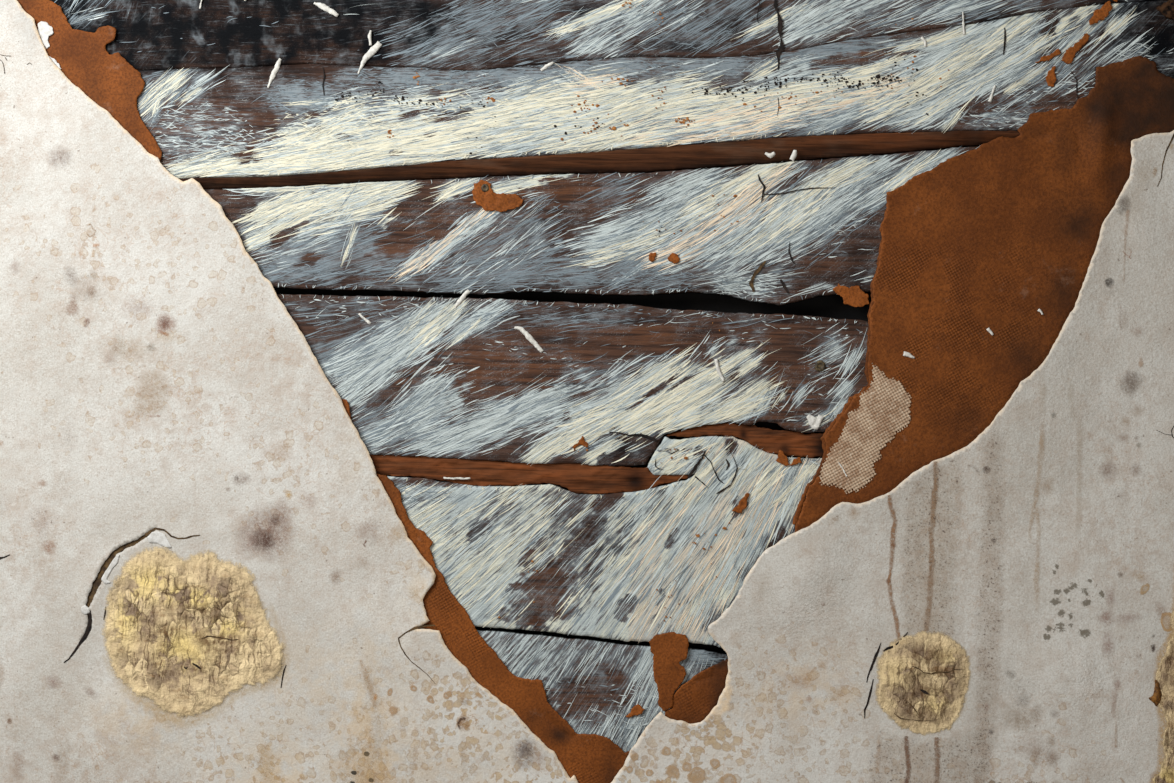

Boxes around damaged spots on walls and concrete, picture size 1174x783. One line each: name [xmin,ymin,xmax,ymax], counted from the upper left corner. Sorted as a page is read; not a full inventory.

peeling [38,21,61,69]
peeling [819,363,911,494]
crack [64,527,200,663]
peeling [102,547,283,717]
peeling [876,631,970,735]
leakage [626,747,736,783]